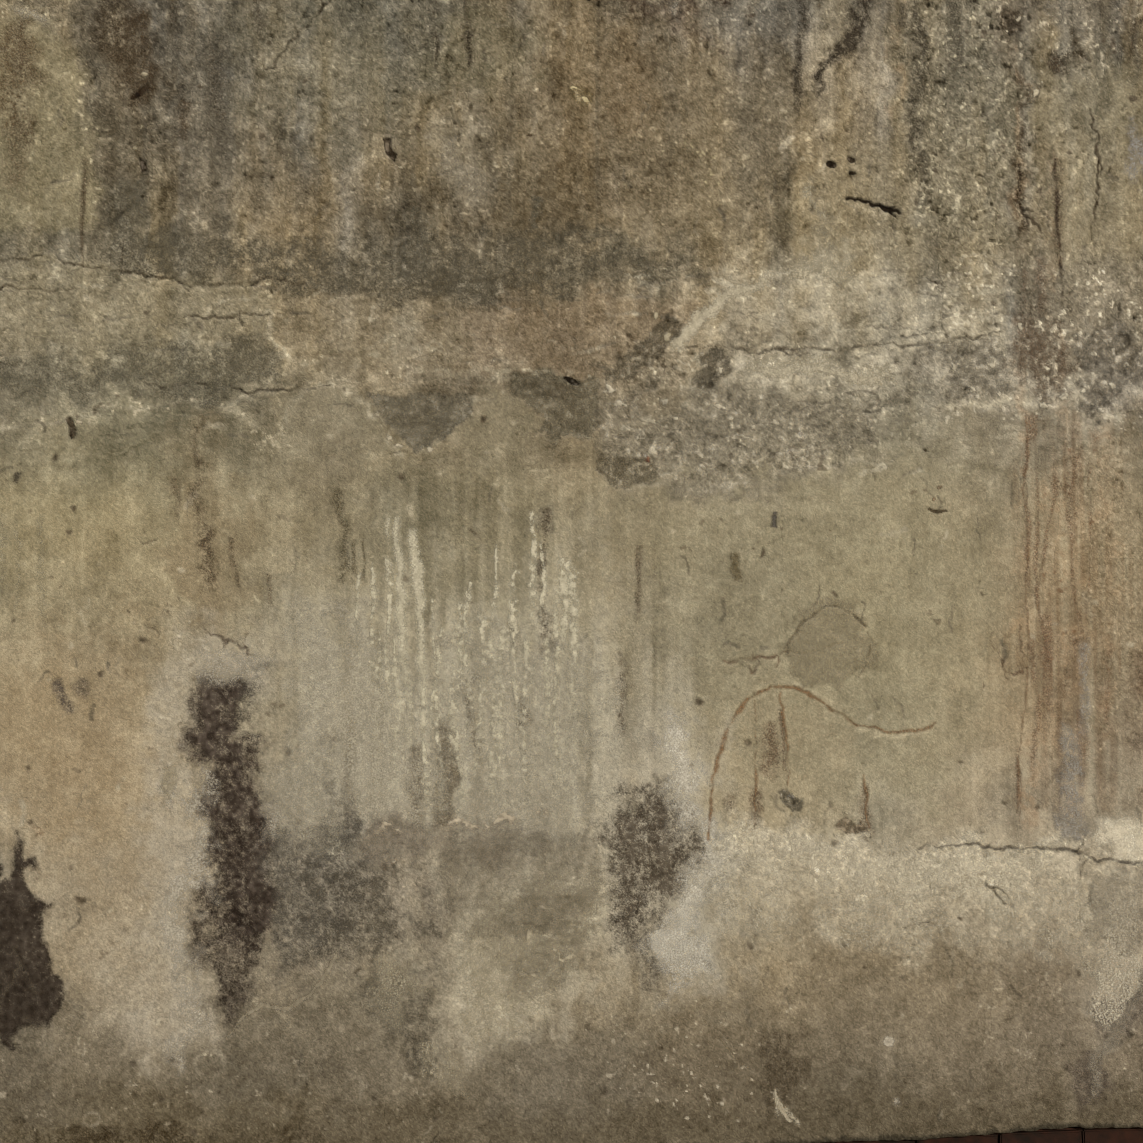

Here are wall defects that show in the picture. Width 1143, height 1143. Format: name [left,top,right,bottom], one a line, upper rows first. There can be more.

crack [845,197,901,218]
damp [0,832,64,1051]
damp [161,490,607,1085]
damp [460,713,1143,1104]
crack [708,655,934,839]
crack [957,843,1139,864]
damp [763,1036,806,1123]